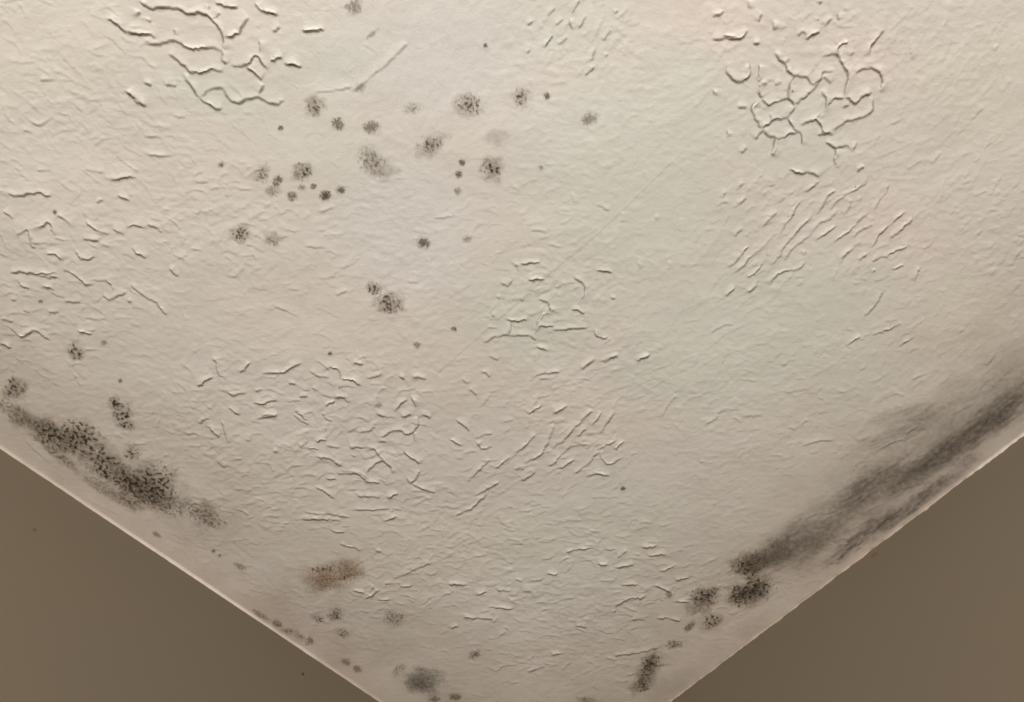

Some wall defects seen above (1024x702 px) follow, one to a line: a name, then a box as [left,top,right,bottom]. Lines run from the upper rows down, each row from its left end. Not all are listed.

crack [89,0,342,127]
crack [694,0,902,187]
peeling [0,160,193,362]
peeling [707,166,936,361]
damp [18,416,175,510]
crack [182,247,665,533]
peeling [442,392,639,528]
damp [841,393,1023,508]
damp [731,528,830,606]
damp [638,656,659,691]